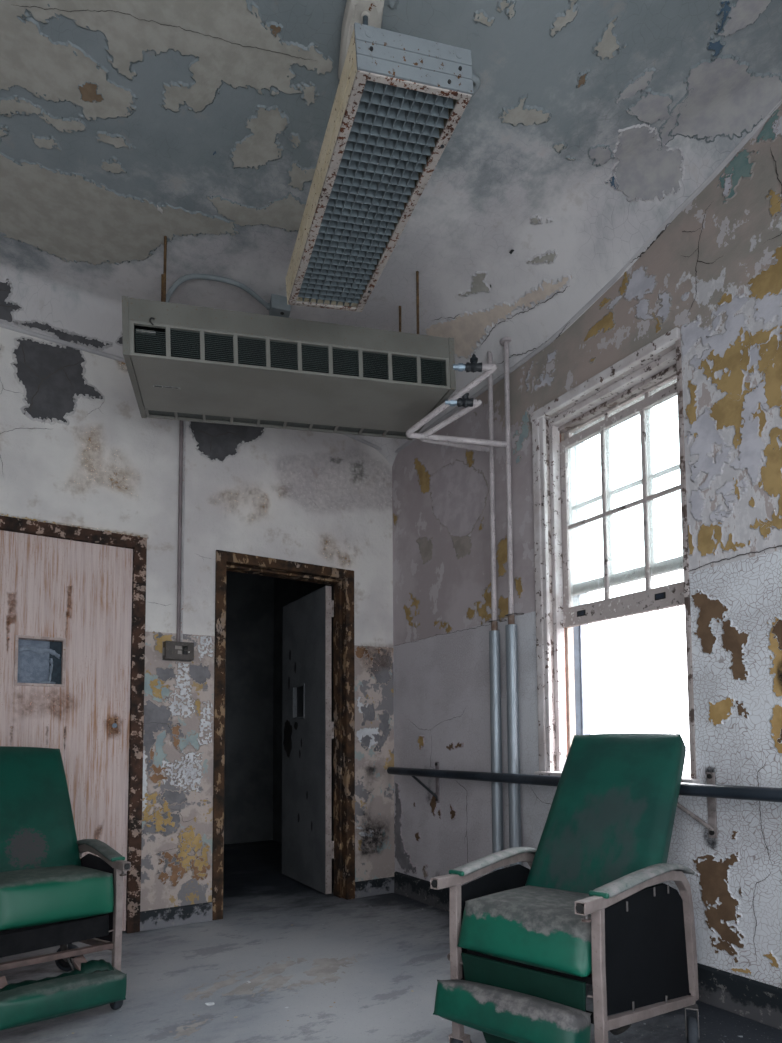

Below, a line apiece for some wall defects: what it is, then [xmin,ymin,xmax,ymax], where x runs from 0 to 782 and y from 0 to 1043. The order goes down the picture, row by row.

crack [16,5,316,61]
peeling [0,0,334,265]
spalling [0,278,123,426]
peeling [680,246,782,557]
peeling [142,635,214,887]
peeling [355,696,392,753]
peeling [466,534,524,626]
peeling [691,589,751,683]
peeling [708,696,751,727]
crack [688,545,782,572]
peeling [766,616,782,755]
peeling [692,830,754,976]